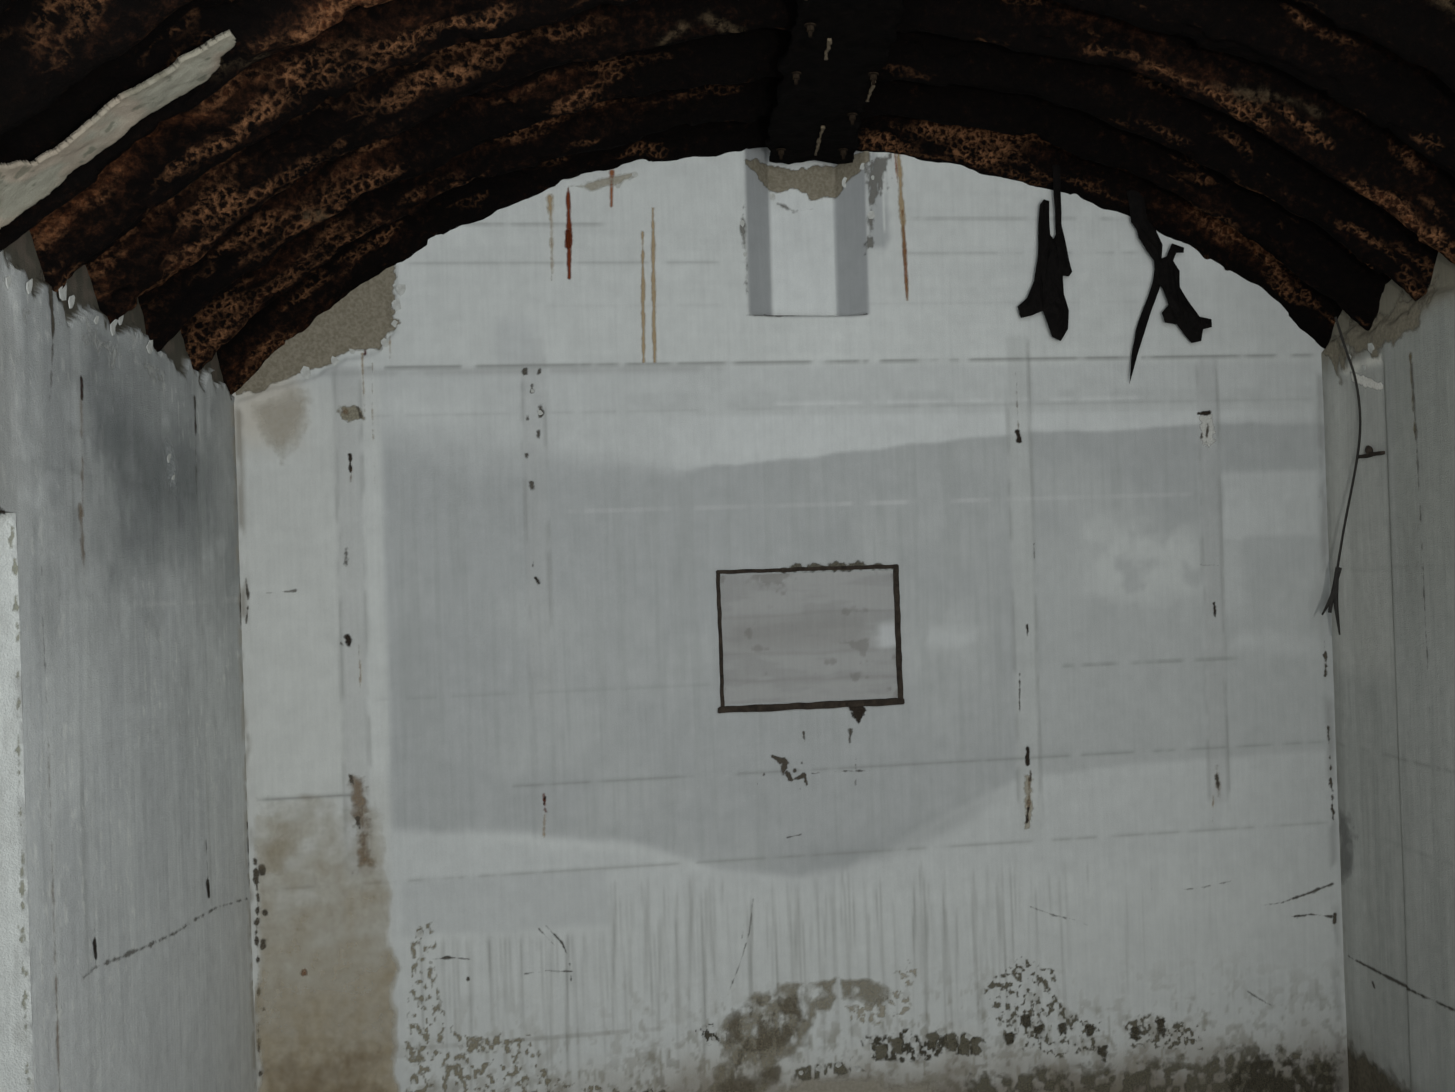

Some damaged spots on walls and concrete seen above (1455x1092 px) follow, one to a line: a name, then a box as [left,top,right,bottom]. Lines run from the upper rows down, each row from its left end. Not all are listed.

spalling [0,30,236,229]
spalling [236,266,405,443]
corrosion [548,188,572,279]
corrosion [641,208,656,363]
spalling [745,151,892,248]
corrosion [896,154,908,294]
water stain [782,560,883,573]
water stain [849,706,866,742]
crack [93,822,267,1076]
water stain [257,915,398,1092]
water stain [710,969,916,1092]
water stain [967,1046,1403,1092]